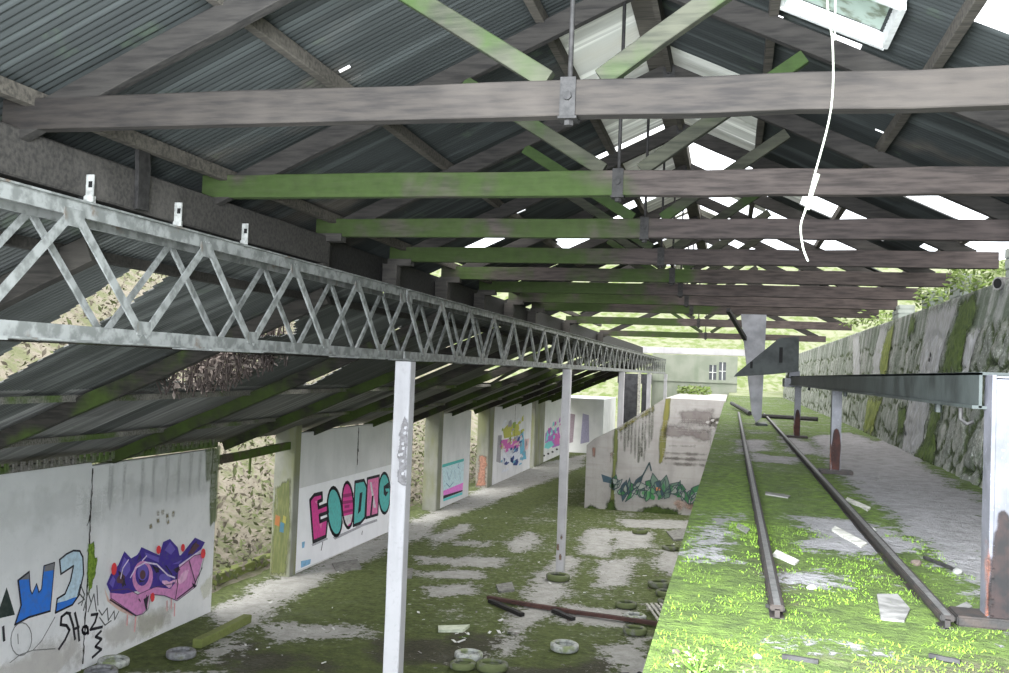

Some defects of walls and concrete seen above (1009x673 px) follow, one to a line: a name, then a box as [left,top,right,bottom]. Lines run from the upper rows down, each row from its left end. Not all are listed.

leakage [610,398,716,506]
corrosion [830,429,841,470]
corrosion [986,511,1009,619]